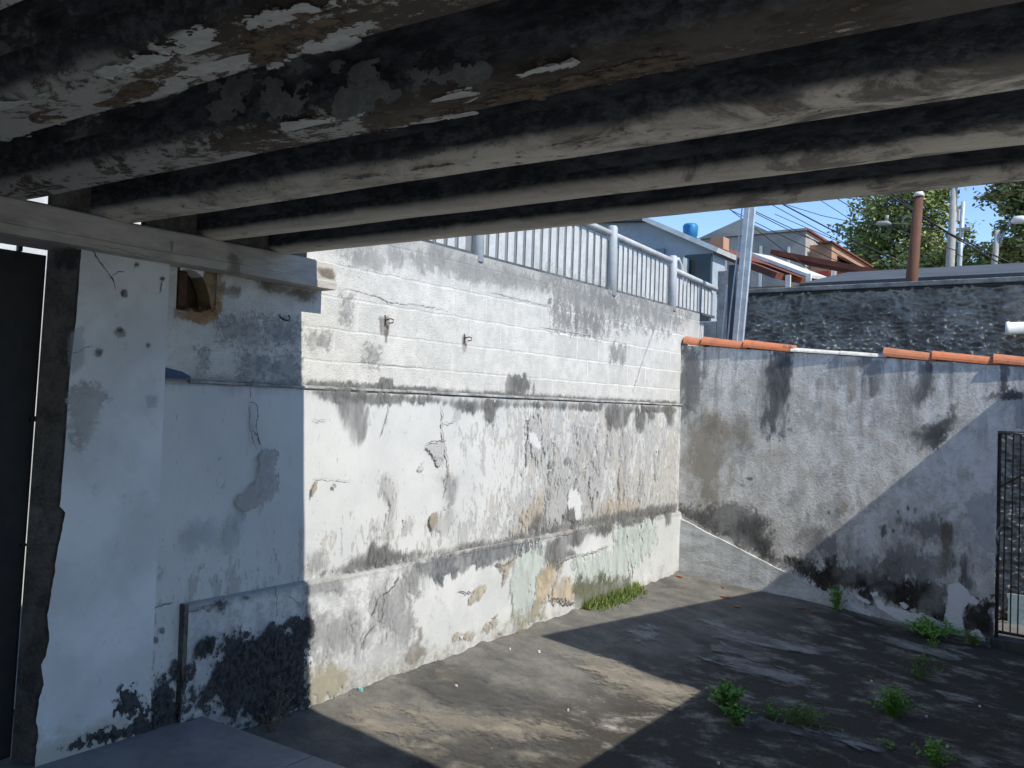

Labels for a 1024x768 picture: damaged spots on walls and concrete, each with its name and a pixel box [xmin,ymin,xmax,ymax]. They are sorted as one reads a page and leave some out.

peeling [0,0,694,142]
crack [87,243,230,292]
crack [248,391,262,449]
damp [215,313,706,440]
damp [761,345,793,441]
damp [990,364,1023,400]
peeling [496,411,660,628]
crack [363,577,399,646]
flaking render [460,584,487,604]
damp [60,502,953,751]
peeling [853,582,985,641]
damp [952,556,998,643]